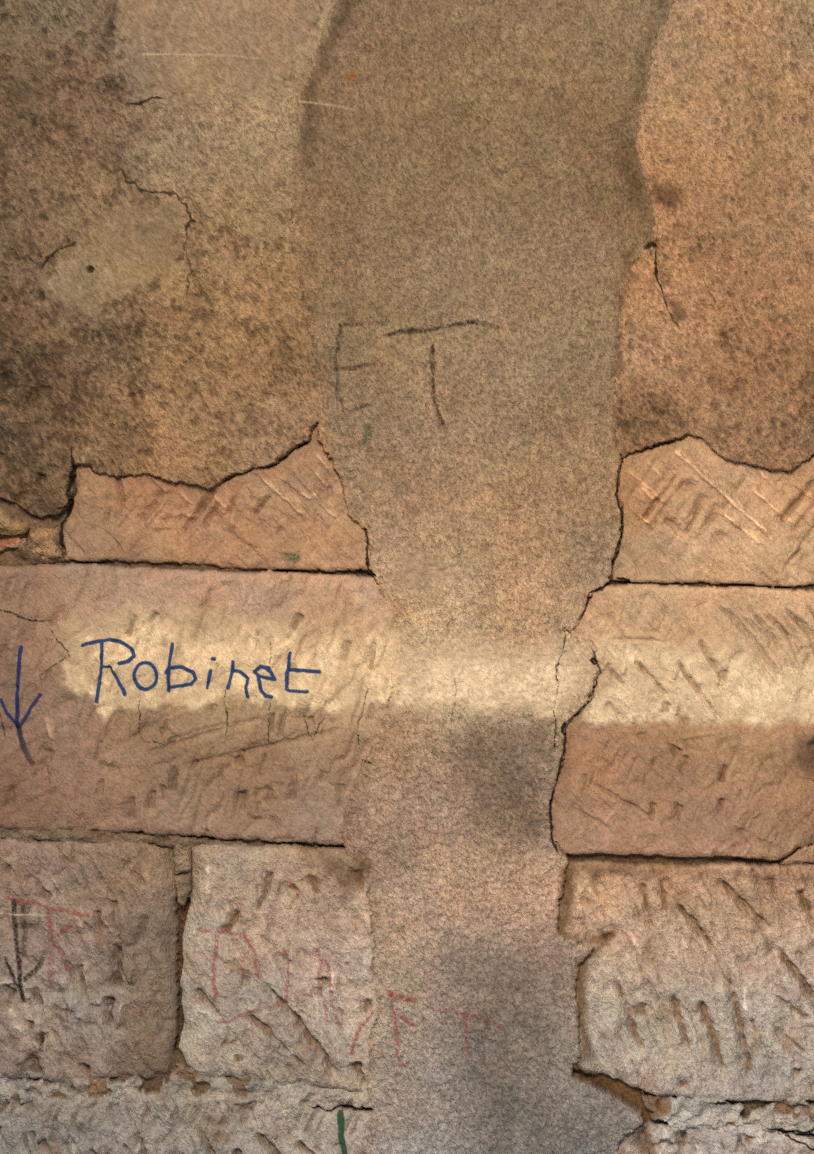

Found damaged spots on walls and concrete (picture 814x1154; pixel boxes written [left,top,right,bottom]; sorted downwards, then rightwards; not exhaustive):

crack [645,241,678,325]
flaking render [0,418,372,572]
flaking render [610,430,814,587]